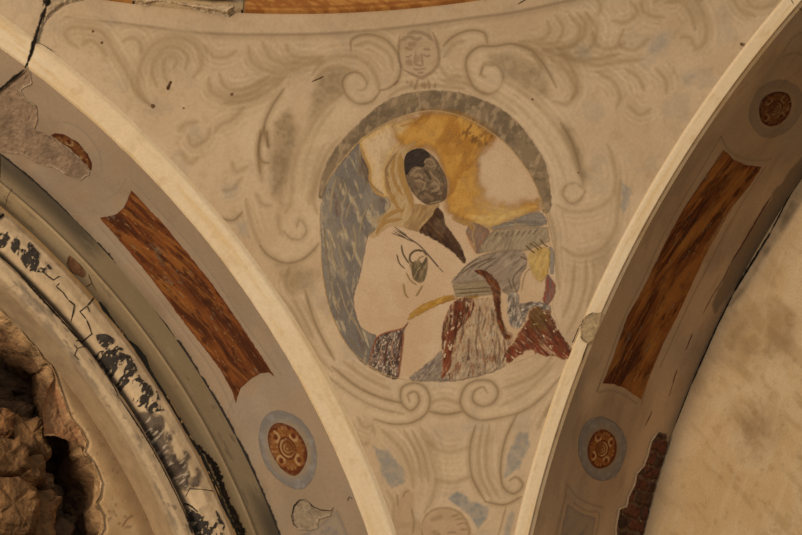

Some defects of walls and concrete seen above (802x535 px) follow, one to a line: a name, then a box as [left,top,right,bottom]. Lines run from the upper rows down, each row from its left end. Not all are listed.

crack [0,0,52,90]
crack [0,153,113,260]
spalling [0,311,104,535]
crack [19,272,215,534]
crack [155,311,281,535]
mould [197,444,247,535]
flaking render [291,499,334,530]
flaking render [615,432,668,535]